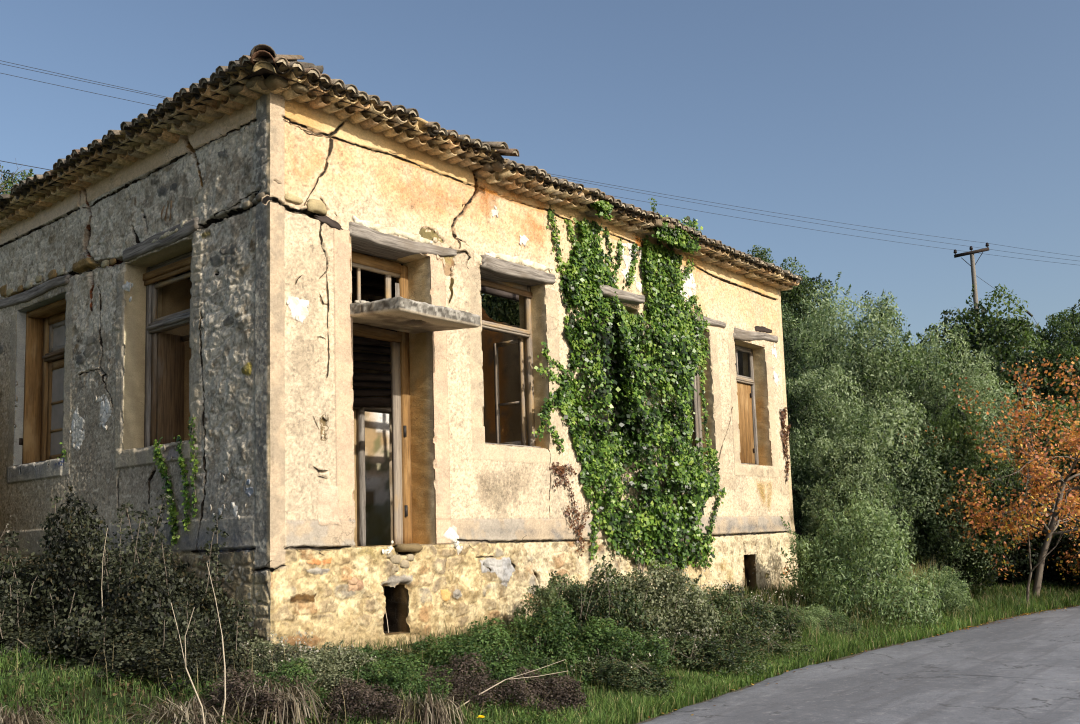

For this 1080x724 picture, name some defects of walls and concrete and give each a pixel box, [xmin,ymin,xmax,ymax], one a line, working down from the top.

crack [602,230,643,247]
crack [0,116,573,407]
peeling [69,406,85,451]
peeling [95,394,113,431]